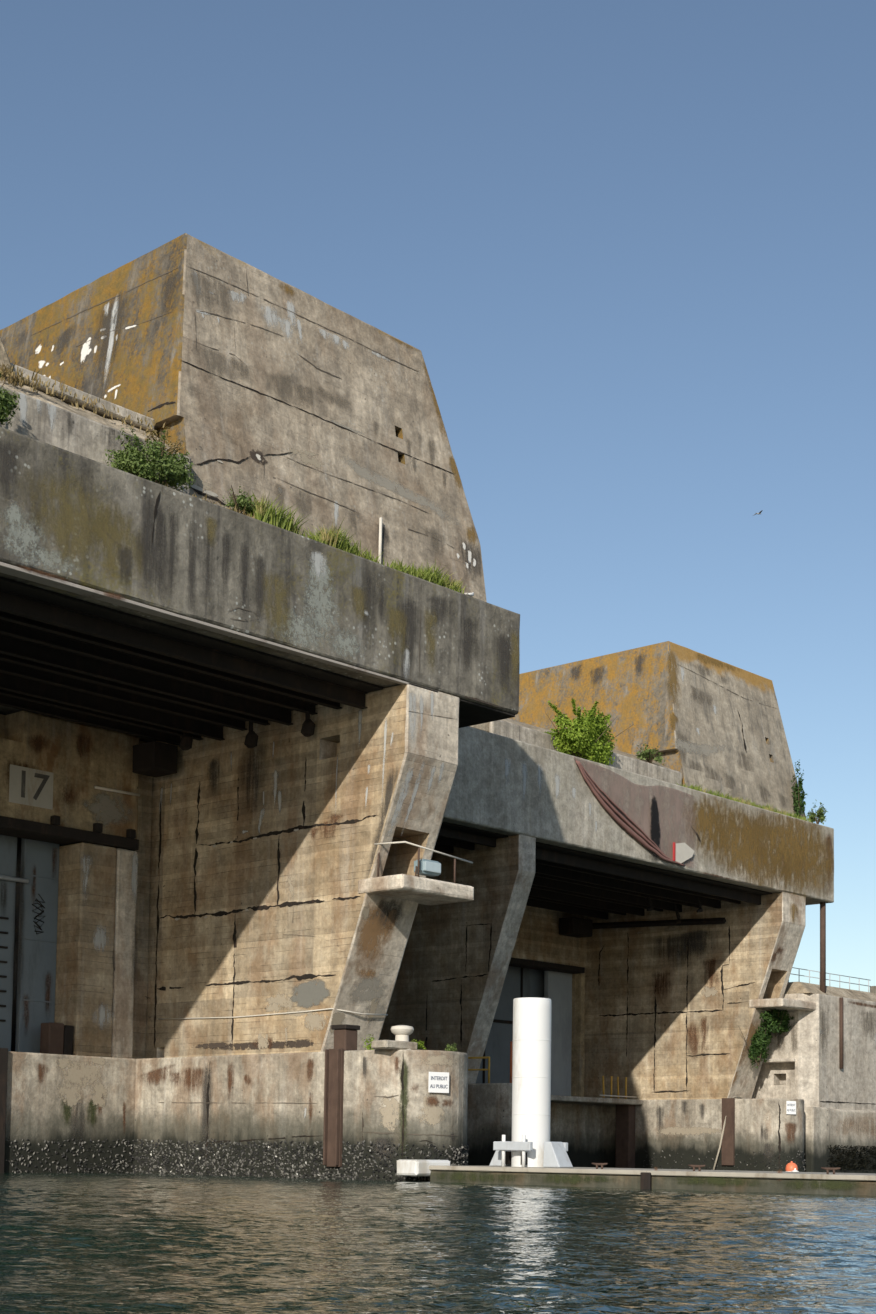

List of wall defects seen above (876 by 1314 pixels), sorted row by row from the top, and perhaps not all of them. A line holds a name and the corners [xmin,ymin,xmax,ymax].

crack [32,267,451,473]
crack [152,452,454,548]
damp [120,503,288,629]
damp [312,552,326,577]
damp [457,543,481,574]
damp [364,578,446,671]
damp [499,634,519,678]
crack [154,760,379,1162]
crack [598,926,755,1093]
corrosion [147,1066,203,1090]